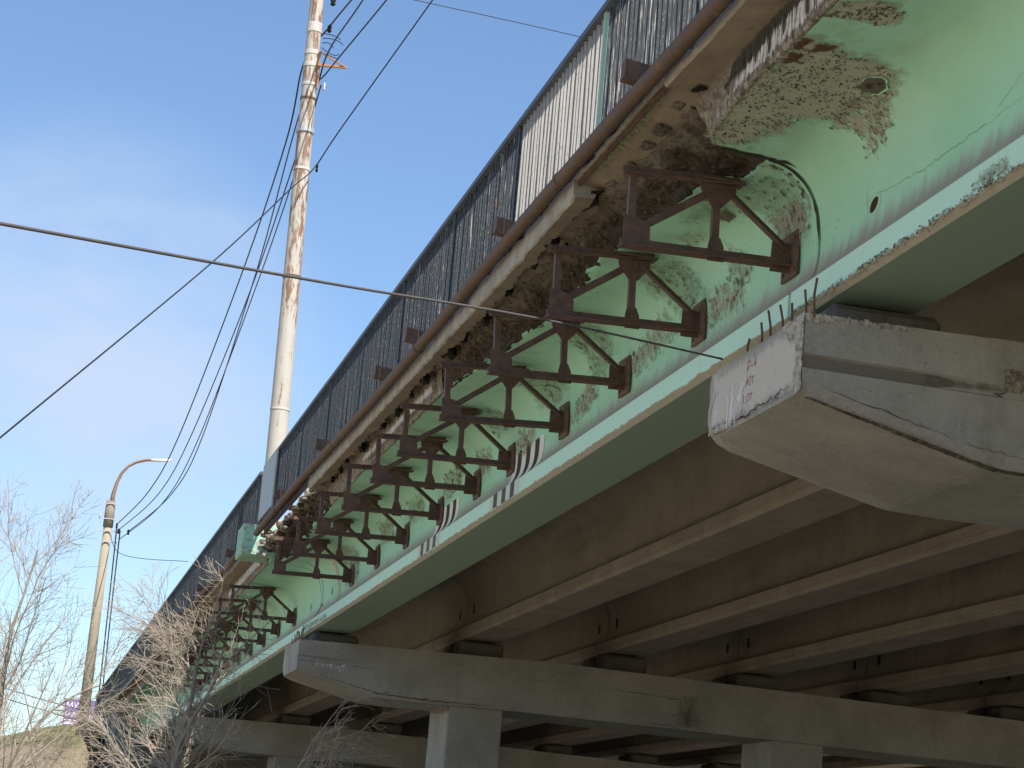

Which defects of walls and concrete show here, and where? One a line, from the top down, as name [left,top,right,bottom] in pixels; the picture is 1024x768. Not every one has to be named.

peeling [824,0,906,26]
peeling [165,37,899,663]
spalling [746,157,1024,477]
crack [822,385,1019,458]
crack [318,674,483,706]